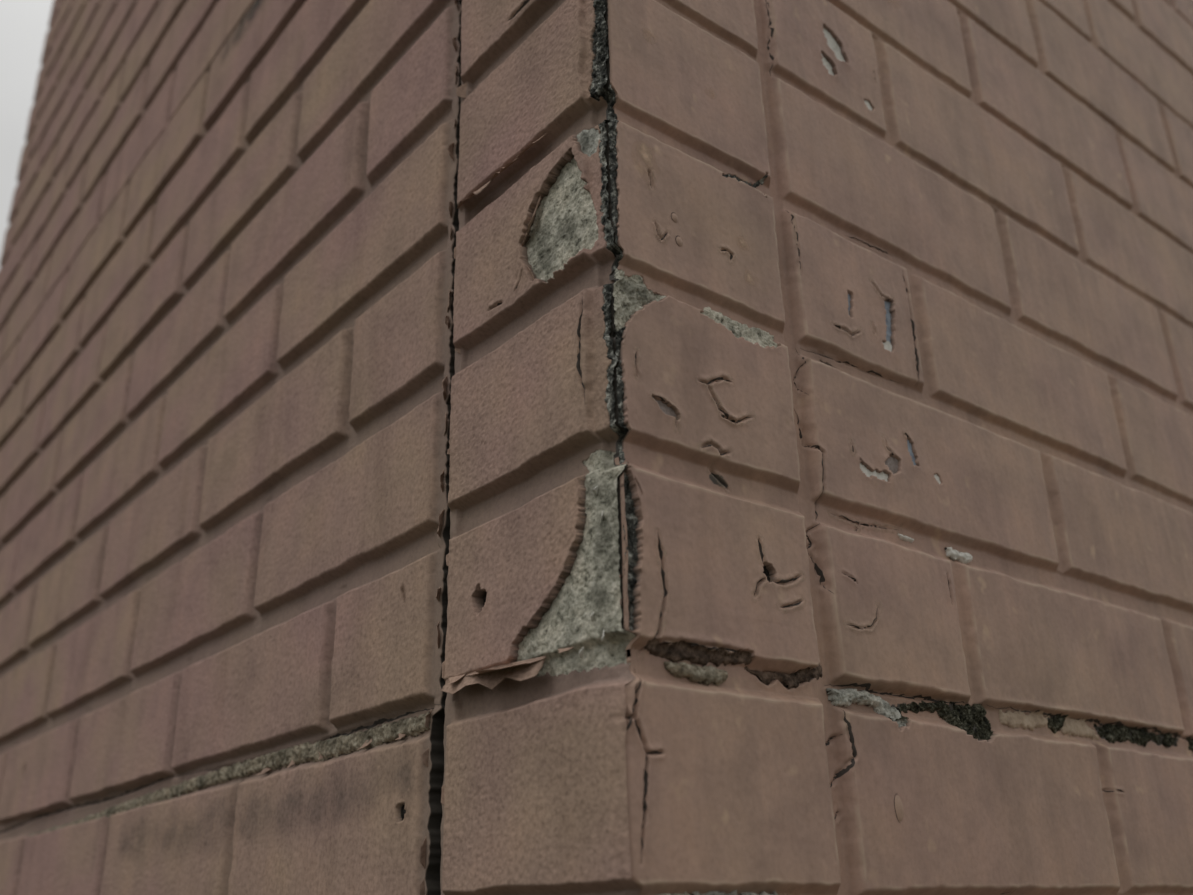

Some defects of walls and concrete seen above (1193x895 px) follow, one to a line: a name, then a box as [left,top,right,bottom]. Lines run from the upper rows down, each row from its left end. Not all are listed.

peeling [821,29,845,76]
spalling [437,0,666,694]
crack [576,303,585,399]
spalling [701,307,778,348]
peeling [882,296,893,351]
crack [700,377,750,423]
spalling [663,661,728,686]
spalling [826,688,908,727]
crack [625,532,1193,862]
peeling [999,709,1049,731]
peeling [1061,716,1099,740]